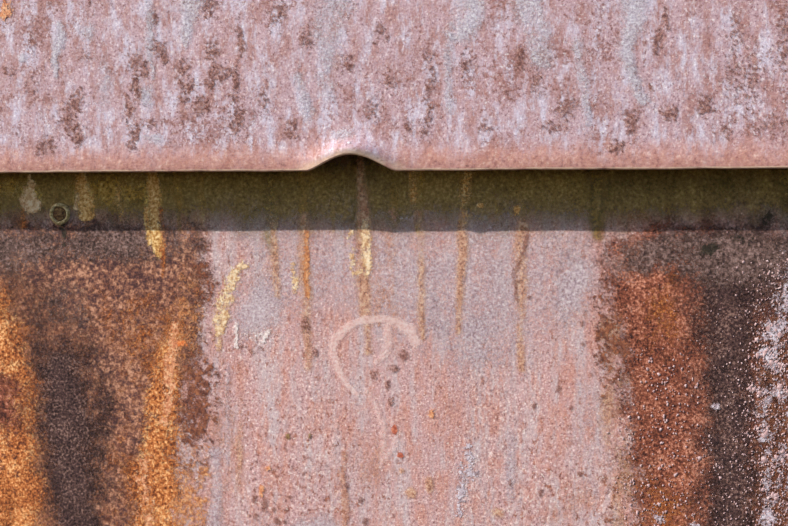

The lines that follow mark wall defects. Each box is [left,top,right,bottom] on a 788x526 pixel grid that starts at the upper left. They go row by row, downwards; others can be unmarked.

corrosion [35,86,85,157]
corrosion [122,4,247,152]
corrosion [715,6,788,135]
water stain [19,174,43,229]
water stain [73,172,96,221]
water stain [143,172,166,278]
corrosion [346,155,398,354]
water stain [588,170,605,240]
corrosion [0,212,250,526]
corrosion [592,210,737,526]
water stain [607,211,788,526]
corrosion [739,276,788,526]